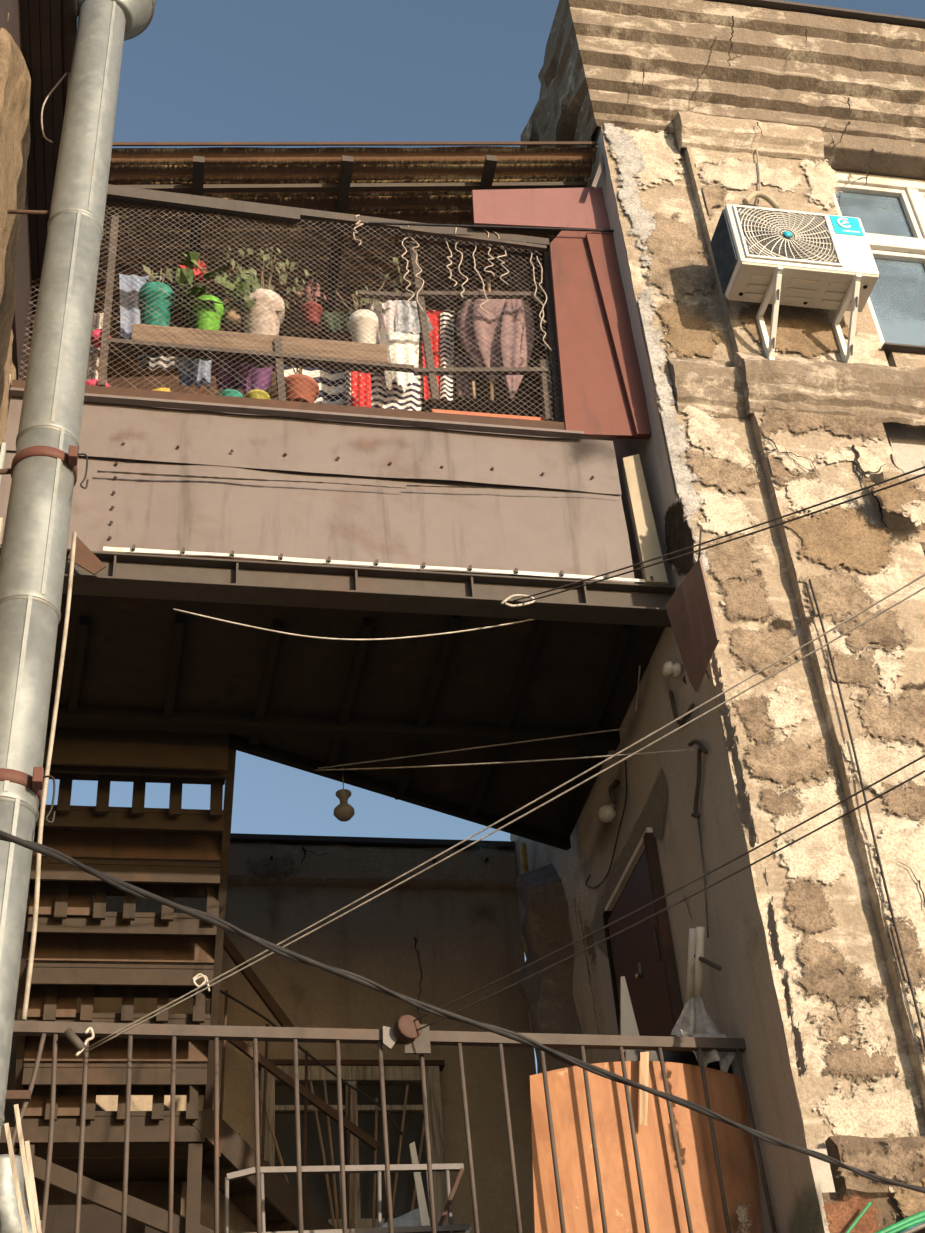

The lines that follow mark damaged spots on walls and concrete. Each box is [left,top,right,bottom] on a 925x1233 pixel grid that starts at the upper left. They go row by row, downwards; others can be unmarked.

crack [727,16,743,67]
crack [825,97,851,150]
crack [851,148,892,185]
crack [759,433,816,472]
crack [852,444,904,529]
spalling [604,123,925,1233]
crack [899,862,925,908]
crack [414,931,422,1024]